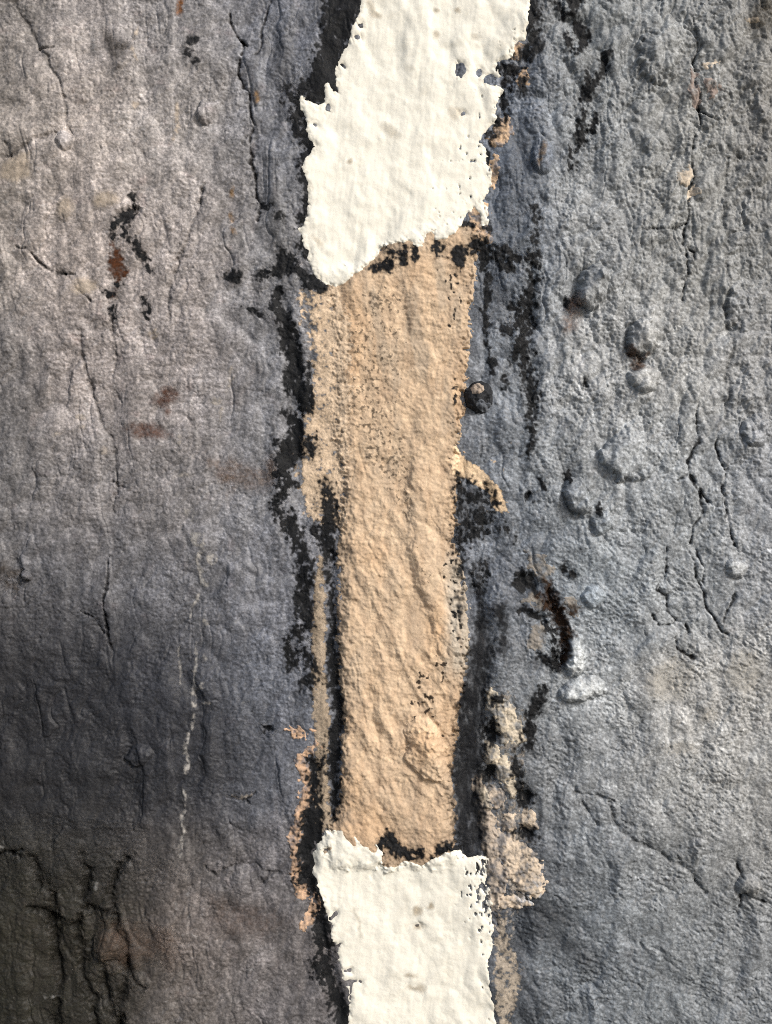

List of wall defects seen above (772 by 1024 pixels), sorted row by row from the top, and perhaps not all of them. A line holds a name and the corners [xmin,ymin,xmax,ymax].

water stain [101,282,124,319]
rust [108,242,129,283]
water stain [109,192,155,274]
water stain [224,269,243,284]
crack [230,12,268,222]
spalling [487,115,514,190]
water stain [240,0,362,1024]
flaking render [328,201,493,868]
crack [652,416,735,659]
water stain [376,470,561,872]
spalling [284,725,323,932]
spalling [470,687,549,912]